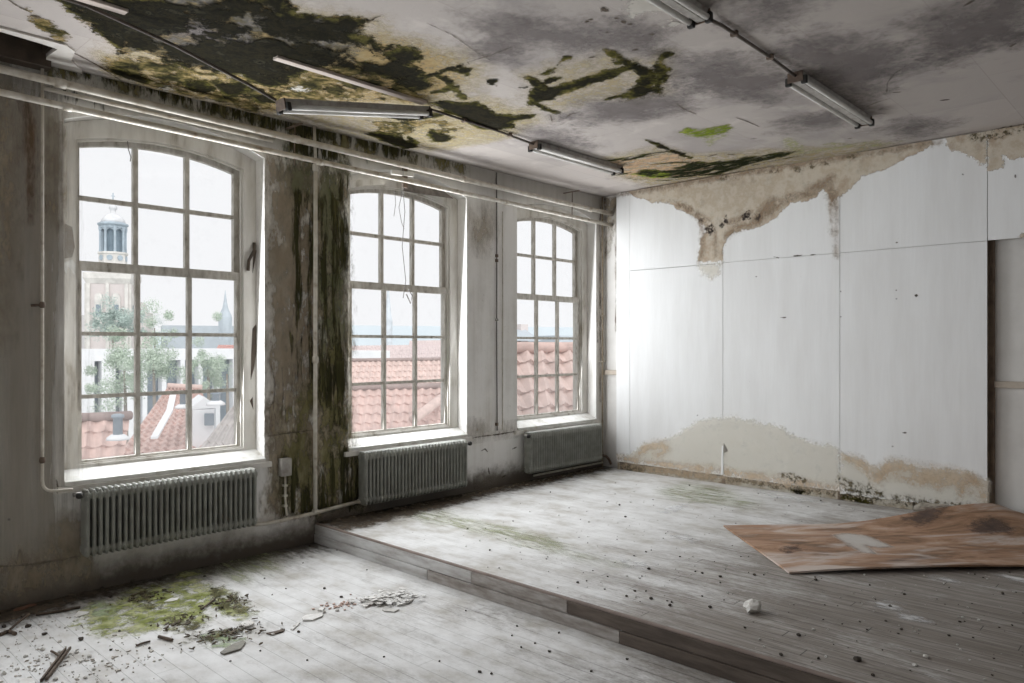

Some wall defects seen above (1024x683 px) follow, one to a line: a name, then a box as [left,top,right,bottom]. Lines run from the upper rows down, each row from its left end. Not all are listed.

water stain [621,141,933,278]
water stain [946,124,1024,171]
water stain [47,67,466,518]
water stain [618,418,987,526]